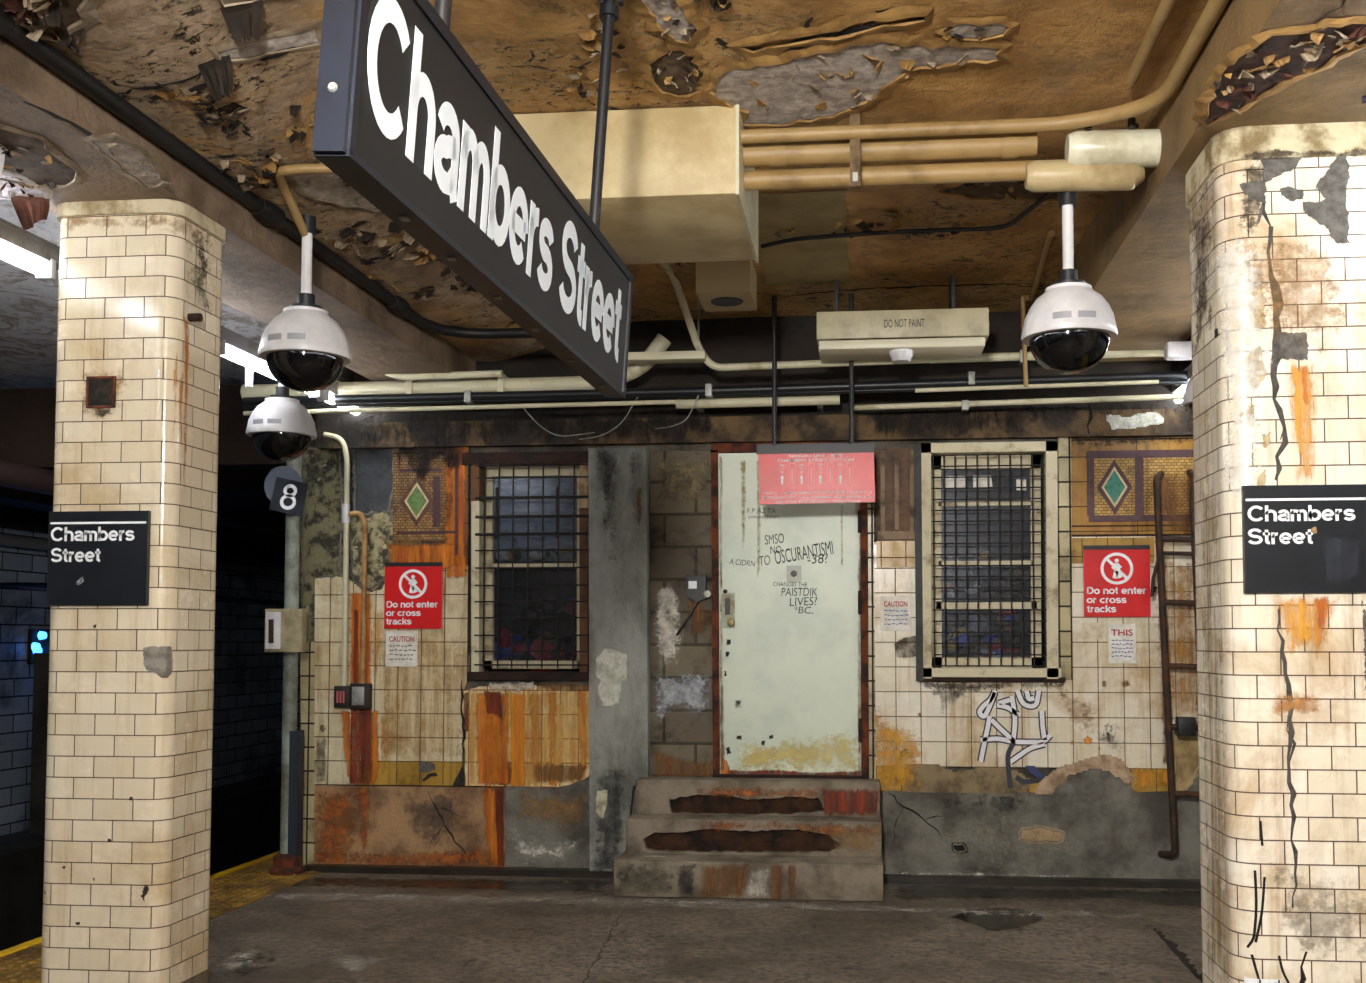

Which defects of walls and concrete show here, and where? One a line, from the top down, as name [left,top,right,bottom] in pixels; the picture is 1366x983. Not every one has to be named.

spalling [154,0,322,138]
spalling [560,0,1020,129]
spalling [1192,16,1366,126]
peeling [0,123,82,230]
spalling [219,105,483,301]
spalling [1240,149,1366,243]
rust [1291,366,1314,475]
rust [1284,598,1327,649]
rust [314,679,589,867]
crack [1277,609,1298,908]
rust [771,866,796,899]
crack [1299,951,1308,983]